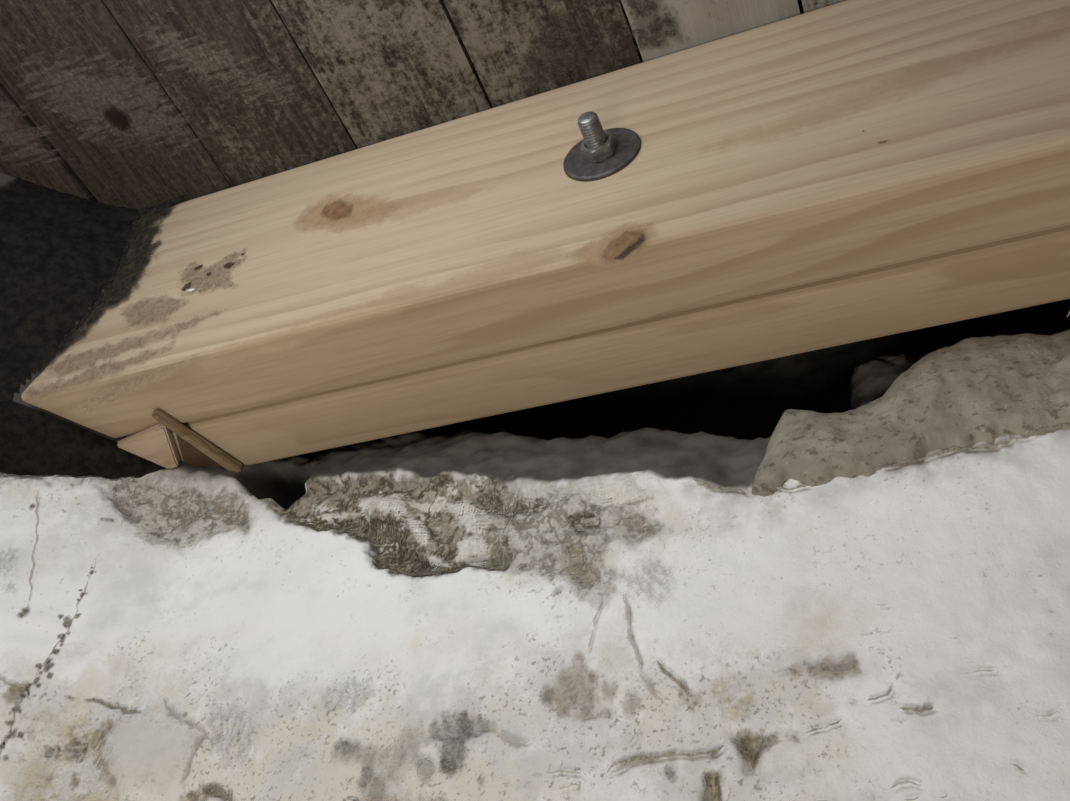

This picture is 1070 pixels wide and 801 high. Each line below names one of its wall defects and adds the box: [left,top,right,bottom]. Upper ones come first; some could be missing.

water stain [627,0,678,49]
spalling [264,470,660,608]
crack [0,561,222,782]
crack [587,593,689,701]
water stain [332,713,530,801]